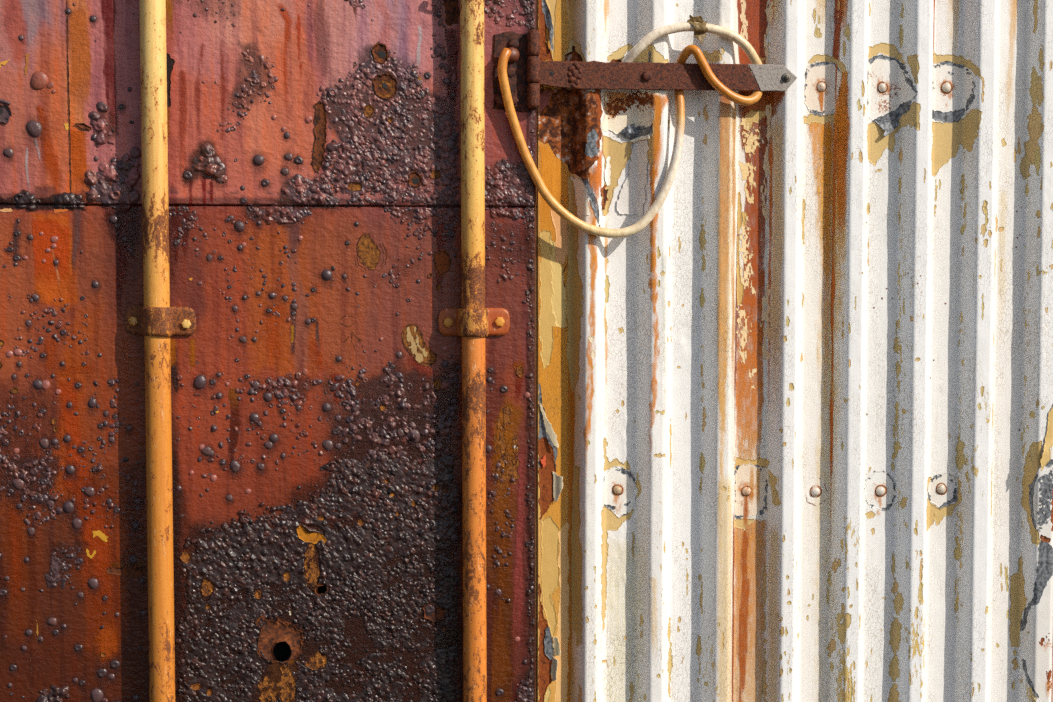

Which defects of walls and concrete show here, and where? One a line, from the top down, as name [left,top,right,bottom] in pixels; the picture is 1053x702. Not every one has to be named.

corrosion [21,617,67,651]
corrosion [0,281,141,601]
corrosion [73,628,120,702]
corrosion [166,0,461,702]
peeling [540,403,641,702]
peeling [539,89,670,401]
peeling [720,457,781,531]
corrosion [718,90,785,702]
corrosion [737,0,779,64]
corrosion [809,0,849,484]
peeling [804,0,985,194]
peeling [1009,398,1053,702]